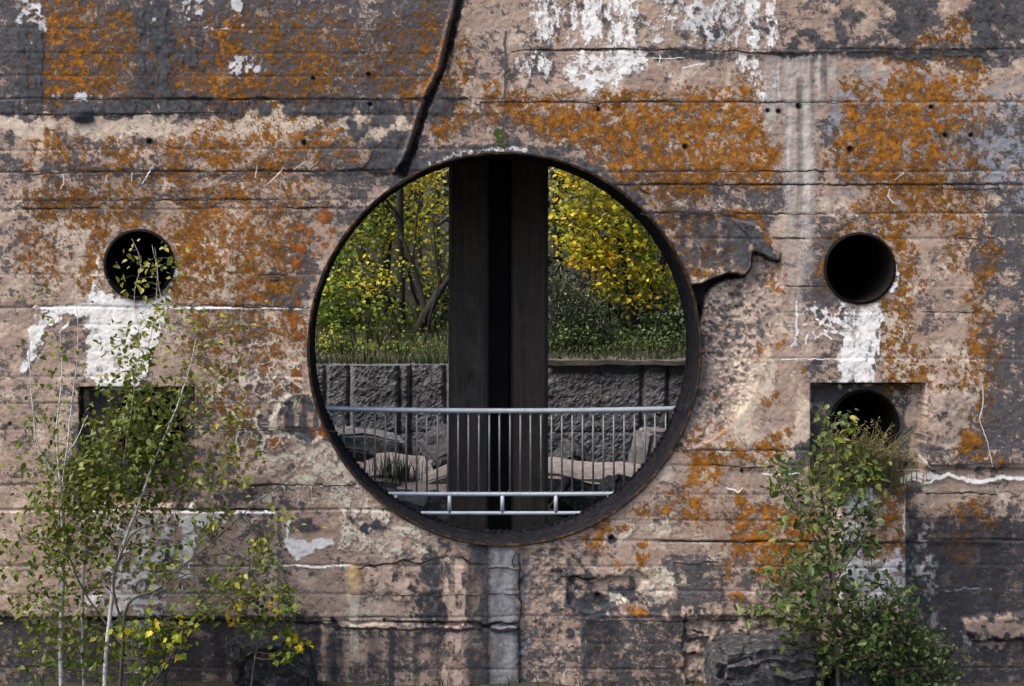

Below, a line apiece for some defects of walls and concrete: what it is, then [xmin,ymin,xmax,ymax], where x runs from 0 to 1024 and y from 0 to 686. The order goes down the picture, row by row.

crack [22,0,999,211]
damp [515,0,1017,280]
damp [20,246,310,392]
crack [232,273,310,309]
rust [287,203,335,273]
spalling [675,223,784,451]
damp [793,301,885,391]
crack [898,388,1024,495]
peeling [607,515,678,543]
crack [659,540,997,565]
spalling [575,565,796,683]